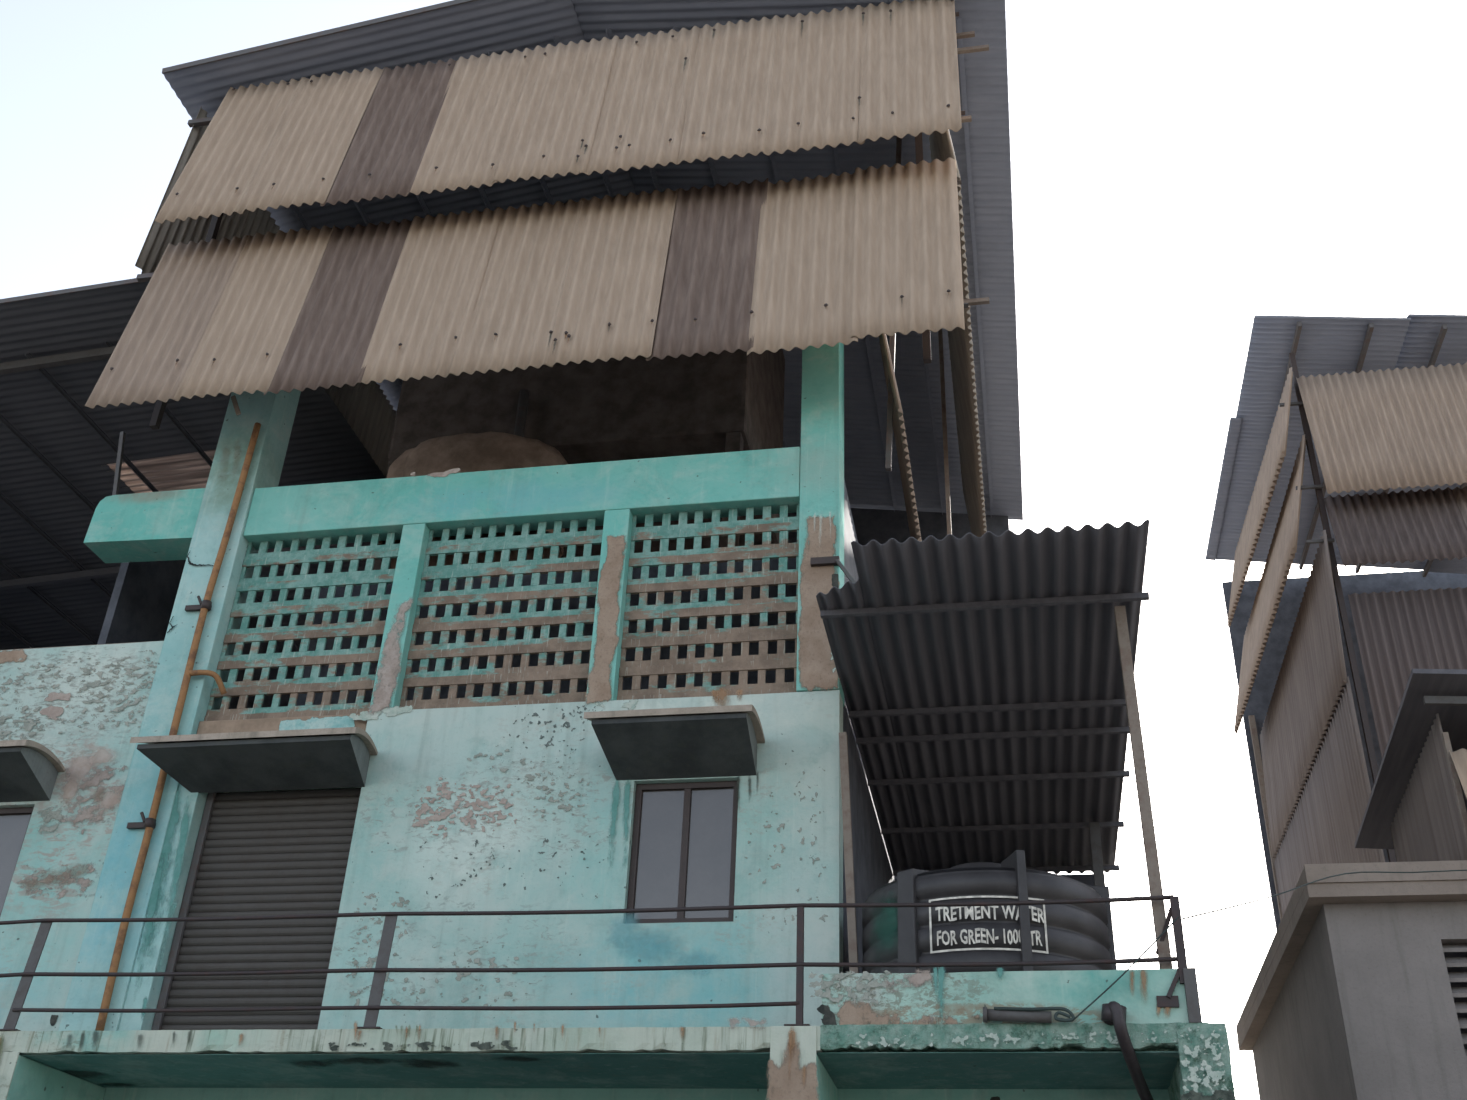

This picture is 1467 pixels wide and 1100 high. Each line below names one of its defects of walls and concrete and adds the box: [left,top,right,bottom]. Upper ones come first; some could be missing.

peeling [798,516,840,691]
peeling [0,647,157,740]
peeling [279,598,413,730]
peeling [409,535,638,890]
peeling [38,756,126,835]
peeling [17,864,95,899]
water stain [67,1031,98,1047]
water stain [64,1071,132,1086]
water stain [296,1058,387,1067]
peeling [767,1043,819,1100]
peeling [809,969,1021,1048]
spalling [1040,1026,1236,1100]